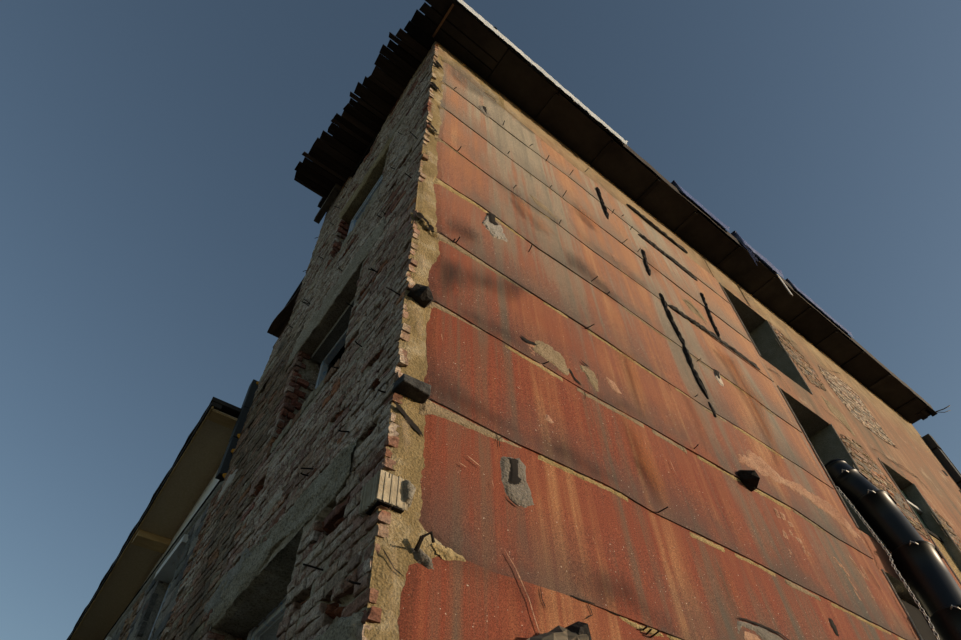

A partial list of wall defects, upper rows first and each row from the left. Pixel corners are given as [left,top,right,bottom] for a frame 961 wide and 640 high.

spalling [482,212,507,242]
peeling [521,335,622,394]
spalling [500,456,534,508]
peeling [737,449,865,544]